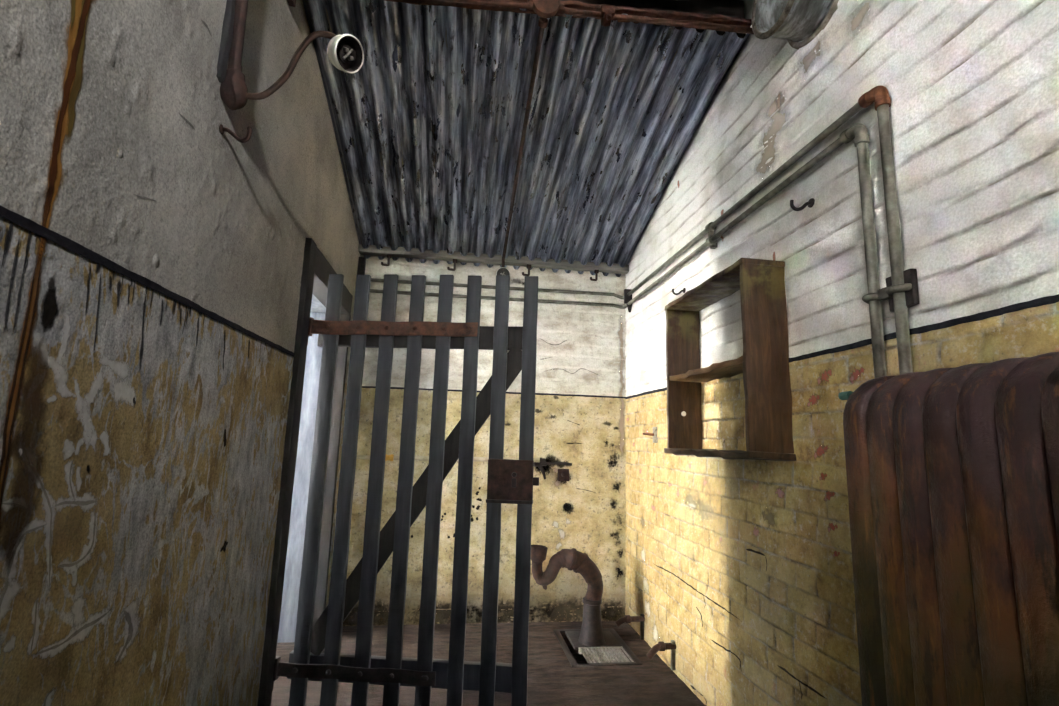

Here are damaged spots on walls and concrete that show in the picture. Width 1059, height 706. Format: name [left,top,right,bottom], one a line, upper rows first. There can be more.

corrosion [0,0,92,529]
damp [610,482,623,577]